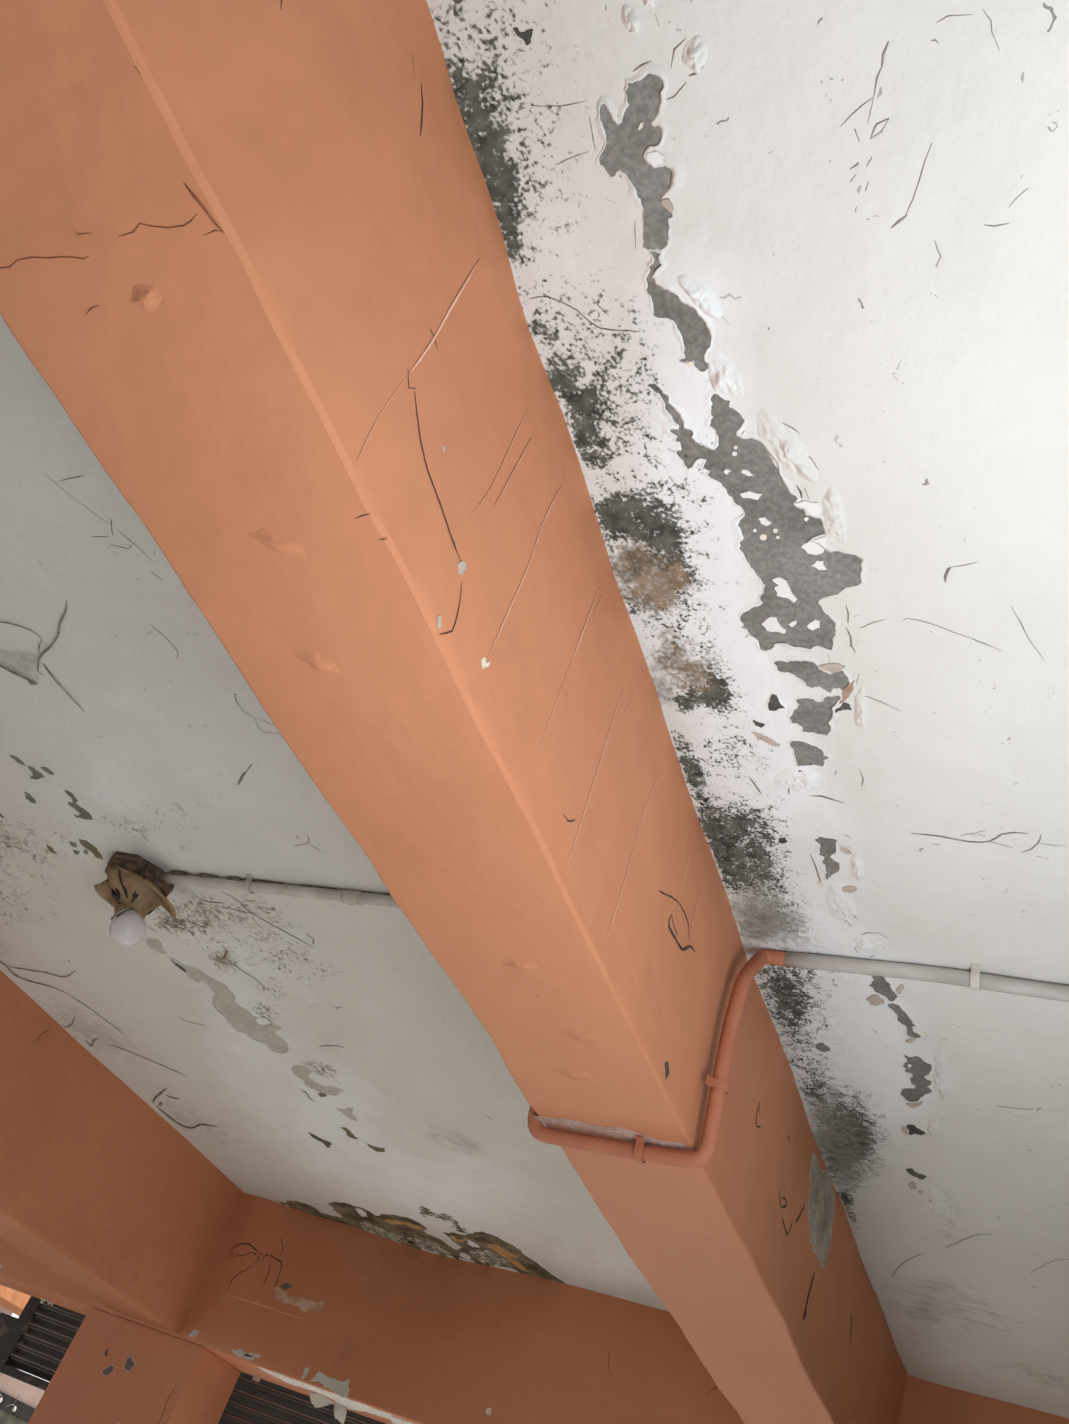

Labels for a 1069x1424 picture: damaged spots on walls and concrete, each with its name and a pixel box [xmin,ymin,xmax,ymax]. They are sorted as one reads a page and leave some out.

crack [0,214,221,269]
damp [433,0,570,269]
peeling [594,60,716,372]
damp [518,275,809,938]
peeling [640,377,870,767]
peeling [808,1152,835,1268]
damp [757,950,887,1228]
peeling [866,975,934,1136]
peeling [905,1168,927,1194]
peeling [231,1349,414,1424]